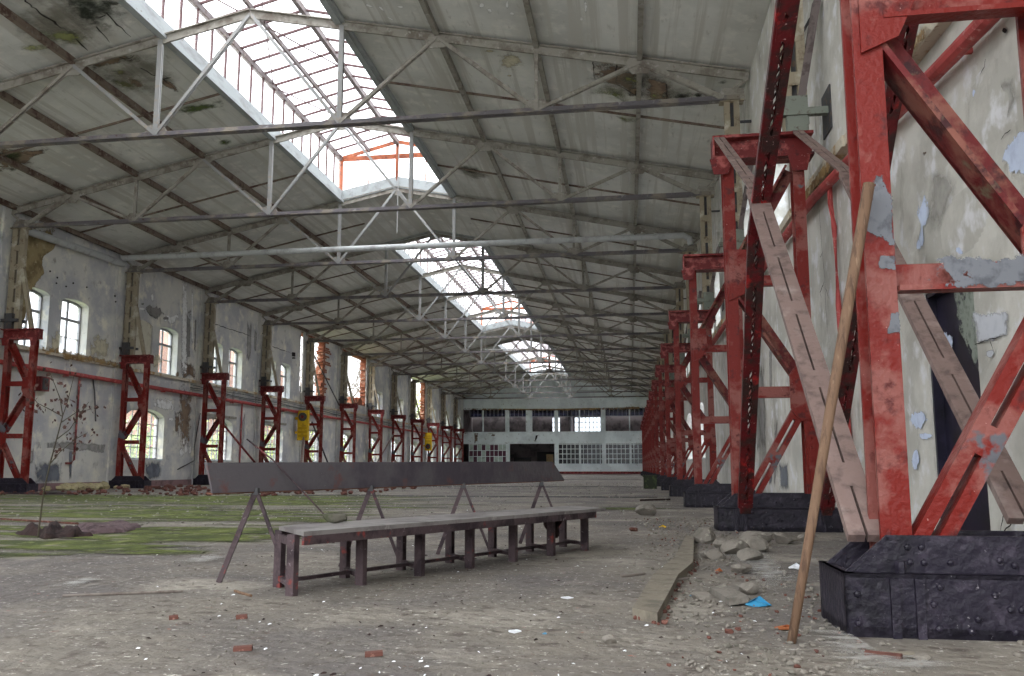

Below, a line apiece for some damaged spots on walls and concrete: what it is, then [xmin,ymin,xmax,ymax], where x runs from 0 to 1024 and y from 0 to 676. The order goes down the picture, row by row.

damp [26,0,115,39]
crack [24,0,174,88]
damp [94,56,176,91]
damp [595,64,700,100]
damp [181,104,214,113]
damp [462,168,486,178]
peeling [1003,131,1024,174]
peeling [954,292,994,371]
flaking render [301,332,366,406]
peeling [910,411,932,470]